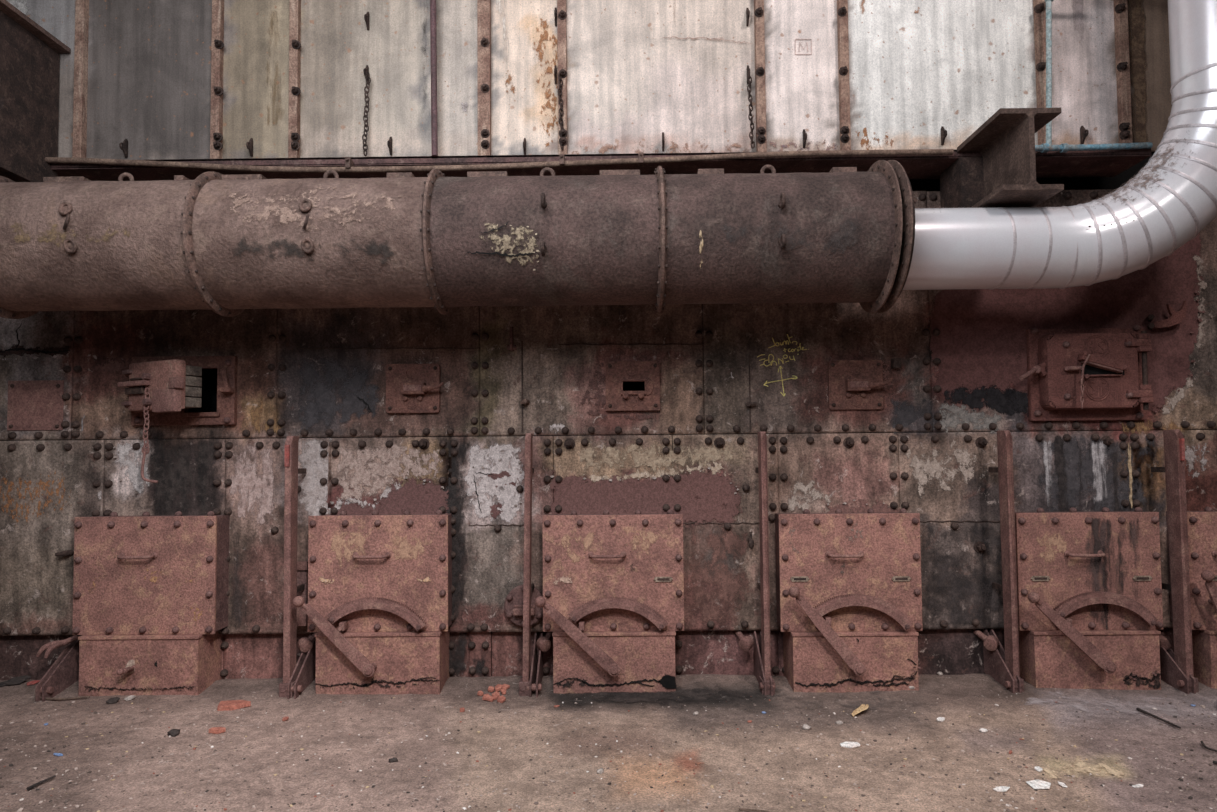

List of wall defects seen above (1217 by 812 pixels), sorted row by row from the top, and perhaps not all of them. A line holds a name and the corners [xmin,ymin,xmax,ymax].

corrosion [533,18,558,147]
peeling [906,232,1213,498]
peeling [298,438,452,516]
peeling [464,444,525,523]
peeling [549,442,746,551]
leakage [1038,435,1157,630]